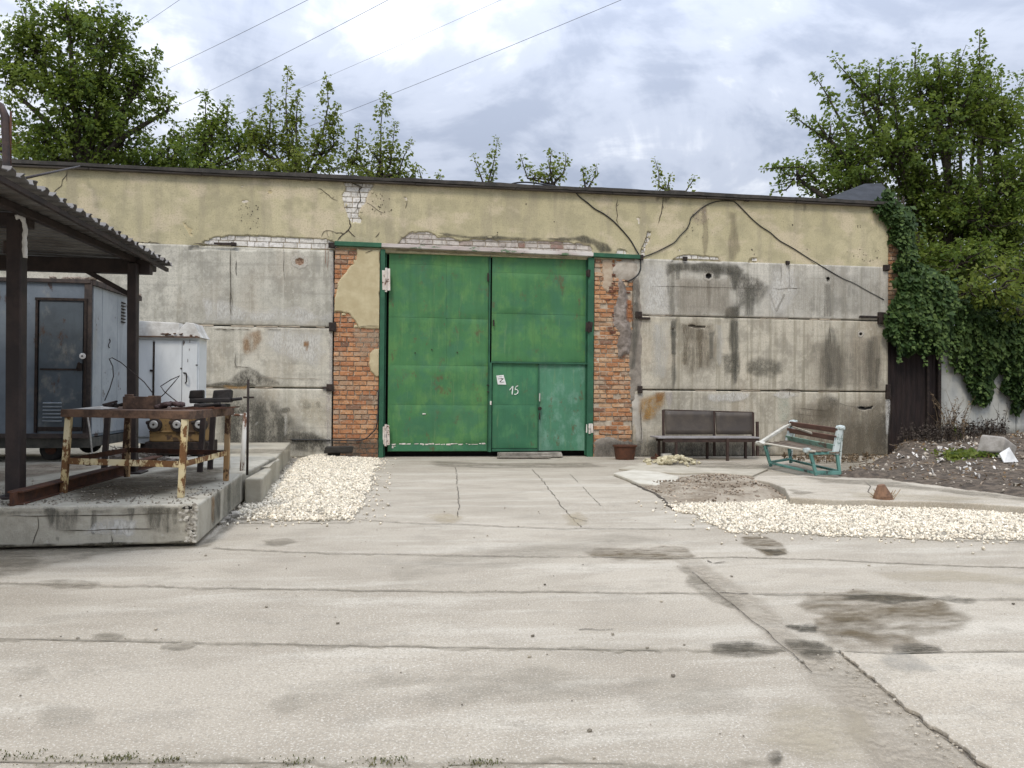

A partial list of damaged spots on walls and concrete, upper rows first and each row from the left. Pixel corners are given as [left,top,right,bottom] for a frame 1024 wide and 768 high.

crack [318,182,407,253]
flaking render [342,183,392,223]
flaking render [399,232,592,253]
flaking render [334,248,380,330]
spalling [604,247,630,334]
water stain [633,262,794,386]
flaking render [369,349,379,377]
spalling [178,503,198,543]